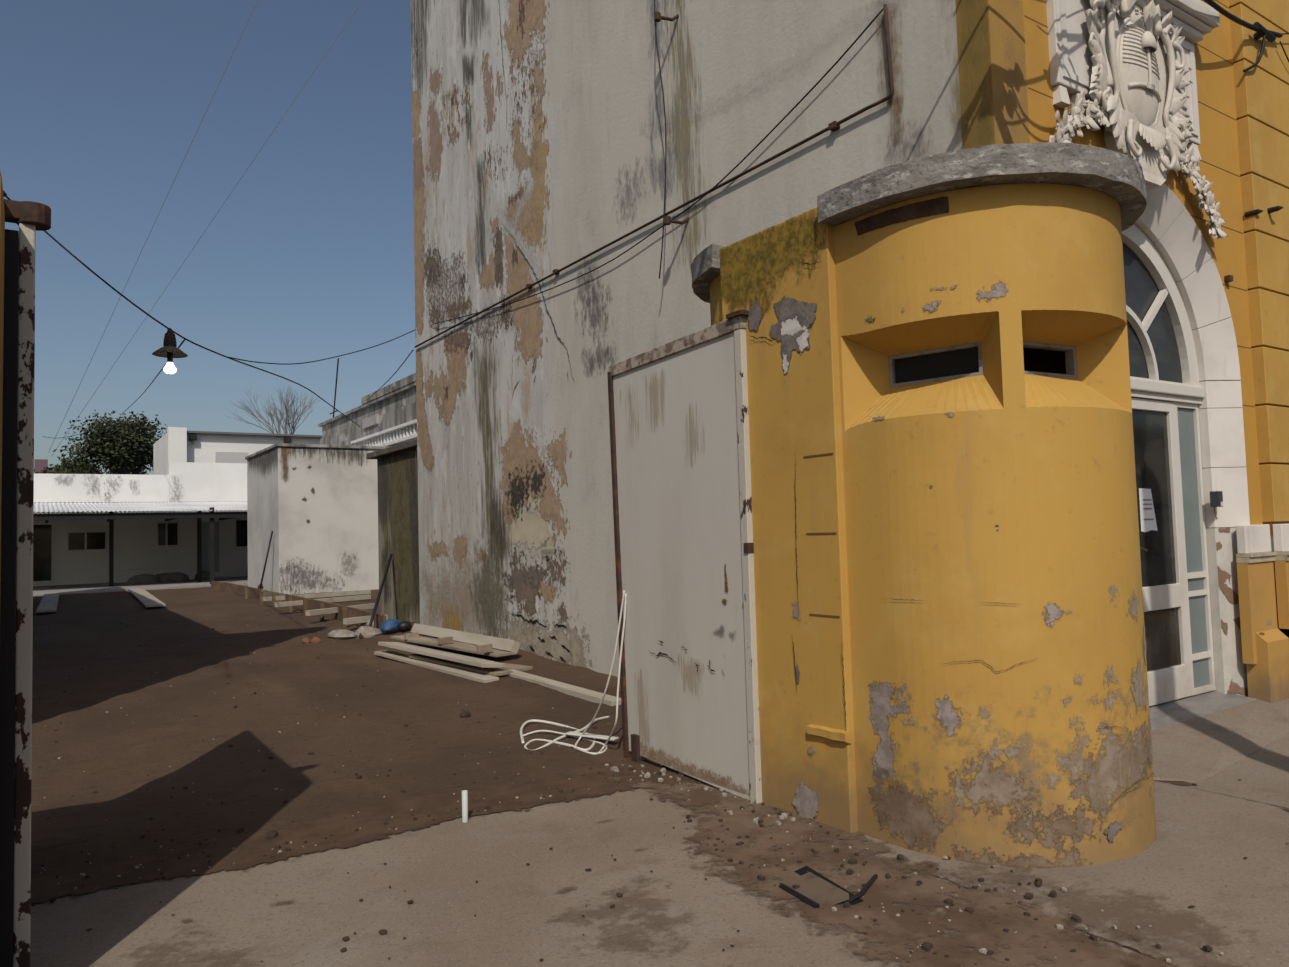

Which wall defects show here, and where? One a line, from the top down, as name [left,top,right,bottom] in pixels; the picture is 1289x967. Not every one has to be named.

water stain [411,0,435,95]
water stain [460,0,484,83]
water stain [956,0,991,148]
water stain [475,158,485,269]
peeling [412,0,552,477]
flaking render [748,295,818,374]
water stain [249,447,390,605]
water stain [406,458,549,636]
peeling [499,418,572,624]
peeling [1214,507,1230,551]
peeling [1218,567,1241,636]
peeling [868,585,1154,867]